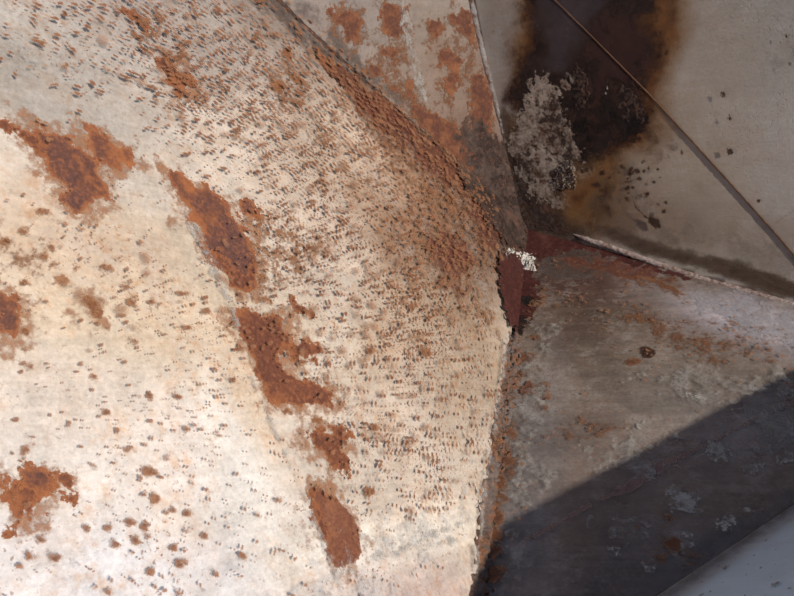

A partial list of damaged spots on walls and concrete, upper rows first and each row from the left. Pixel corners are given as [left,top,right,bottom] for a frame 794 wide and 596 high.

rust [0,0,570,596]
rust [555,269,794,368]
leakage [580,224,794,297]